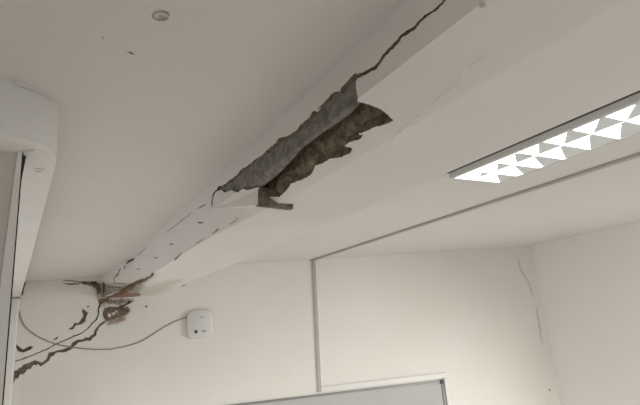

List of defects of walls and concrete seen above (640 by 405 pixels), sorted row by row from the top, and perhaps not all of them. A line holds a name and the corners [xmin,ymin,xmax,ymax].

spalling [212,0,446,216]
crack [13,248,146,382]